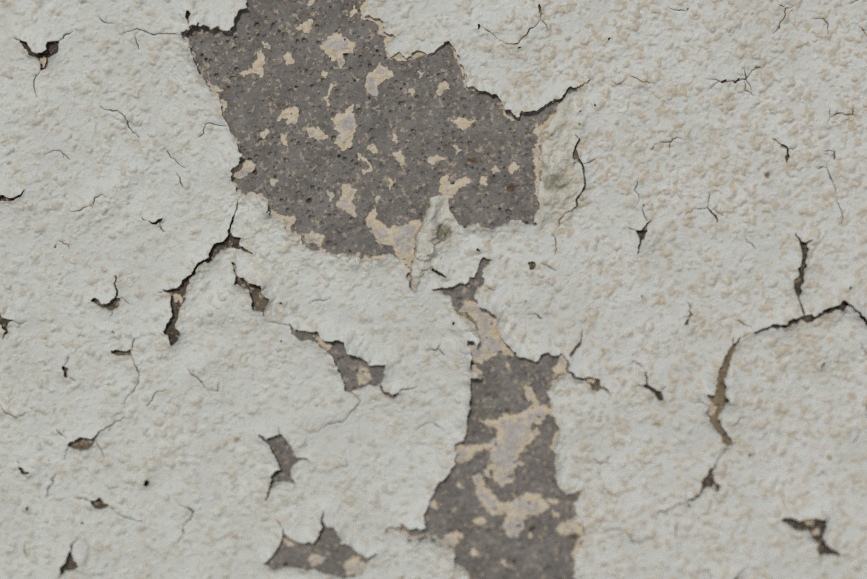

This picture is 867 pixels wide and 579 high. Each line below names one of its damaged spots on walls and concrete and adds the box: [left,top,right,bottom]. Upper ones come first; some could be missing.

peeling [123,0,591,293]
crack [551,135,595,256]
crack [628,178,651,254]
crack [0,314,26,339]
crack [91,275,128,317]
peeling [384,248,586,579]
crack [571,329,609,393]
crack [630,361,665,401]
crack [656,233,867,537]